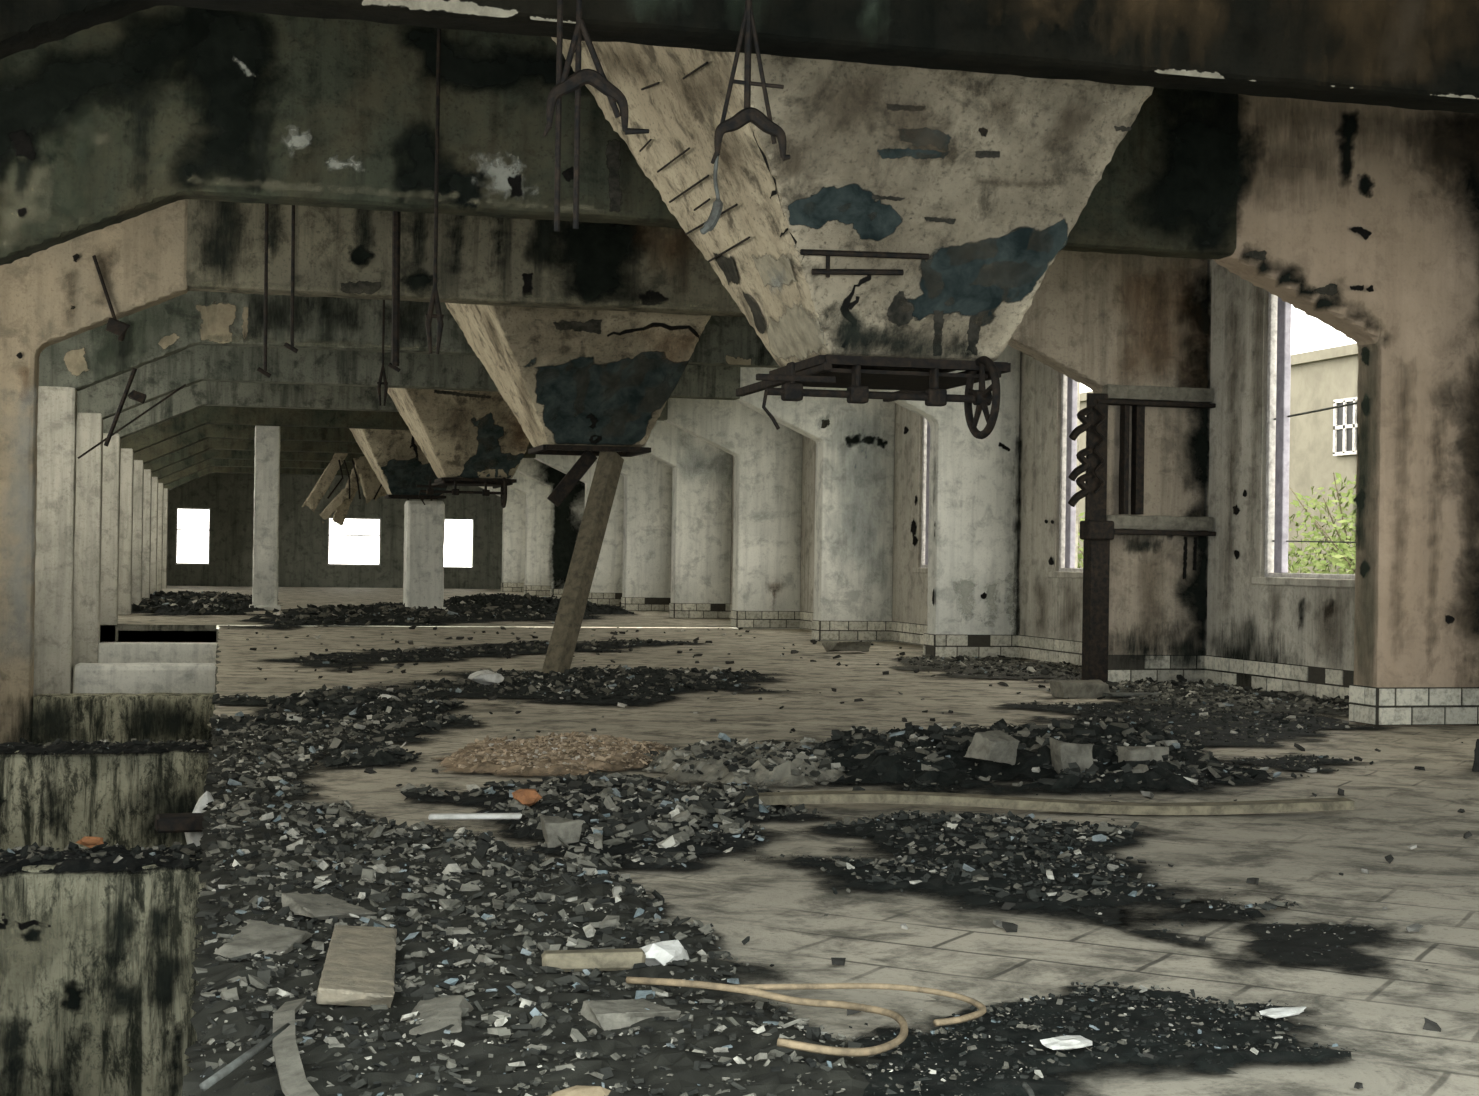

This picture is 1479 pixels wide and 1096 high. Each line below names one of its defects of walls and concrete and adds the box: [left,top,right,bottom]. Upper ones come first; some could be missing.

water stain [288,129,309,147]
water stain [487,159,521,191]
spalling [669,175,738,235]
spalling [341,281,381,294]
water stain [349,209,374,267]
spalling [522,273,533,298]
water stain [526,219,648,304]
peeling [708,184,1068,367]
peeling [525,290,702,445]
water stain [61,980,83,1011]
water stain [105,907,197,1096]
water stain [0,1020,25,1096]